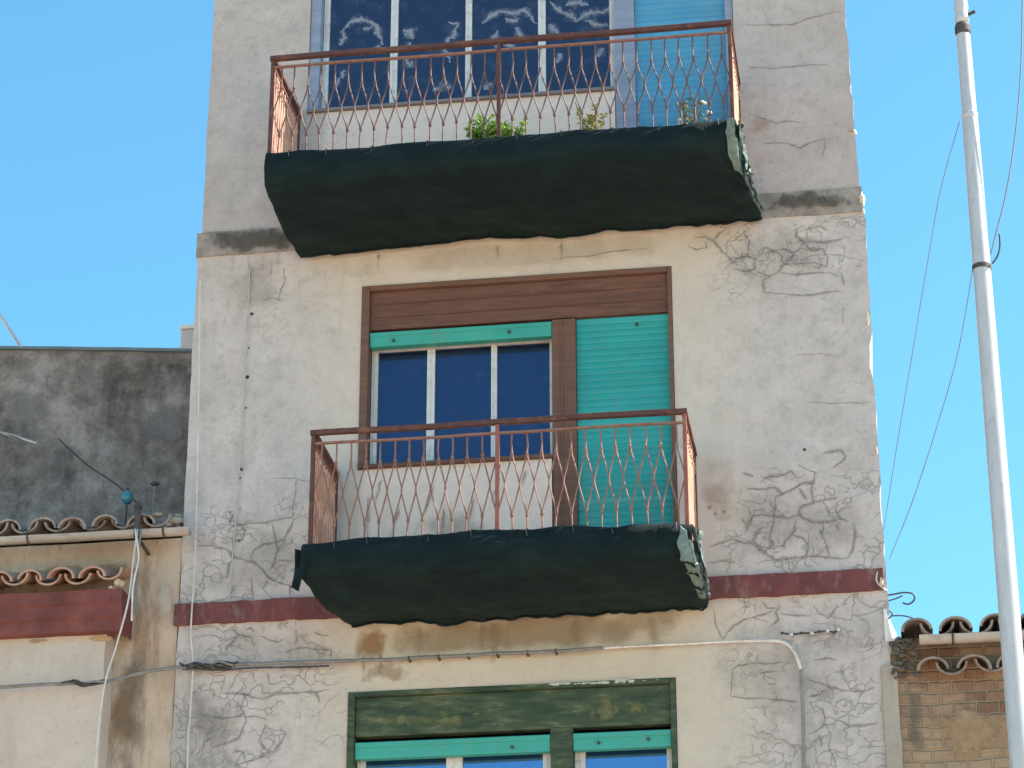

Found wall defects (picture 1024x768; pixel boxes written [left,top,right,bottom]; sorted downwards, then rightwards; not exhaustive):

leakage [770,191,850,209]
leakage [215,229,292,251]
leakage [427,617,629,650]
leakage [114,663,145,739]